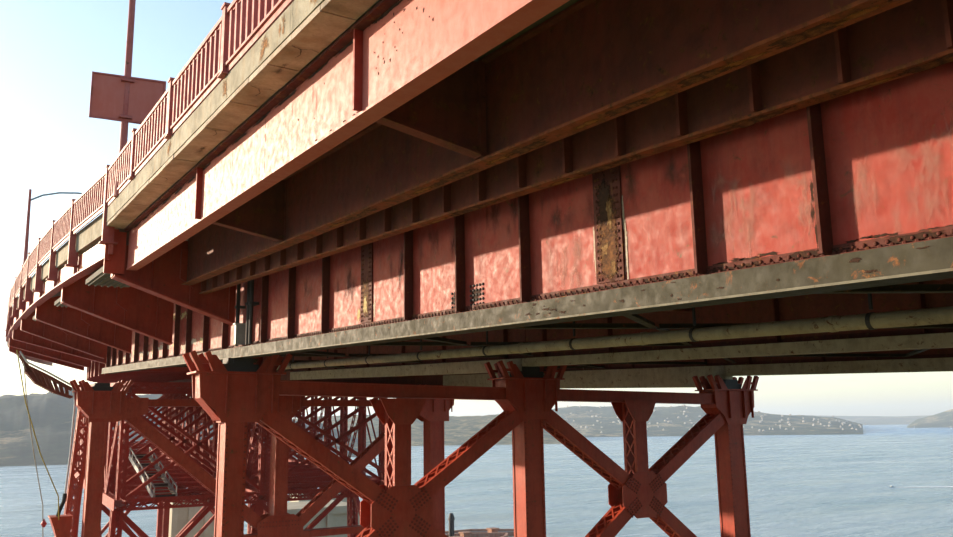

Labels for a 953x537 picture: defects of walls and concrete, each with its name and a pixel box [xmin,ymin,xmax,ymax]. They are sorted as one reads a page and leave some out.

rust [271,280,403,346]
rust [512,175,629,315]
rust [641,273,685,300]
rust [708,251,778,274]
rust [790,182,819,259]
rust [832,225,953,273]